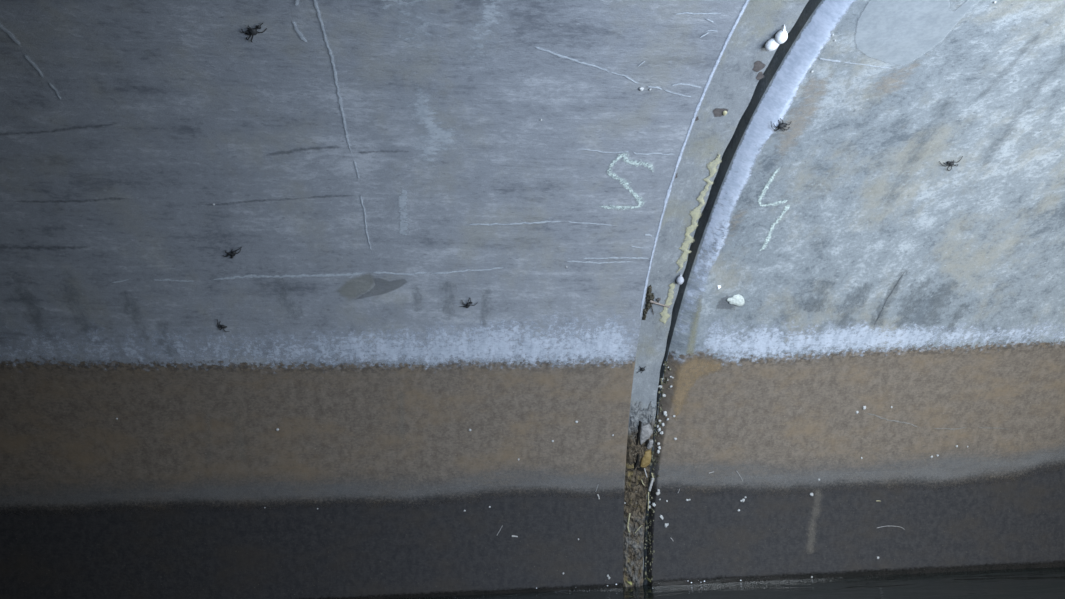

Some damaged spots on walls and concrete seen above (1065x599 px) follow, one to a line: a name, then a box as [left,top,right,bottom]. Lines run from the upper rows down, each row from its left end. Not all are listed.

water stain [407,89,459,161]
water stain [0,314,638,599]